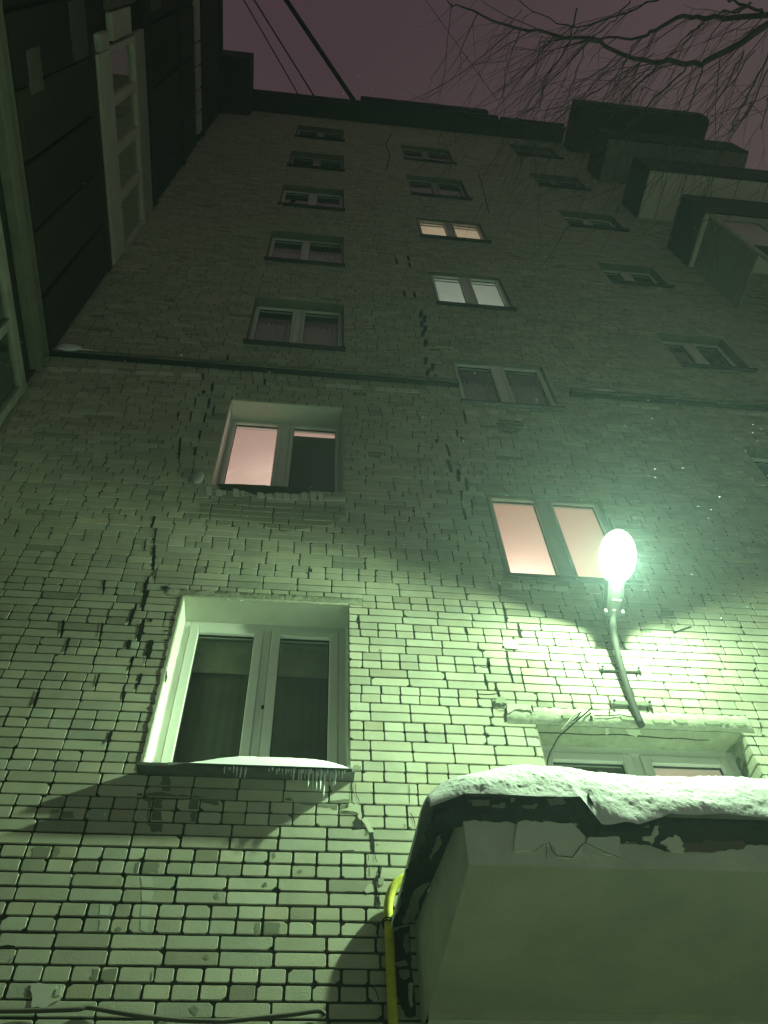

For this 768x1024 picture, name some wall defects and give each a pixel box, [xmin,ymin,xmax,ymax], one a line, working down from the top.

crack [419,311,435,375]
crack [435,439,469,489]
crack [99,516,157,700]
crack [60,620,70,651]
crack [32,691,40,707]
peeling [468,797,707,859]
crack [533,837,670,858]
spalling [720,829,768,851]
spalling [394,925,416,1018]